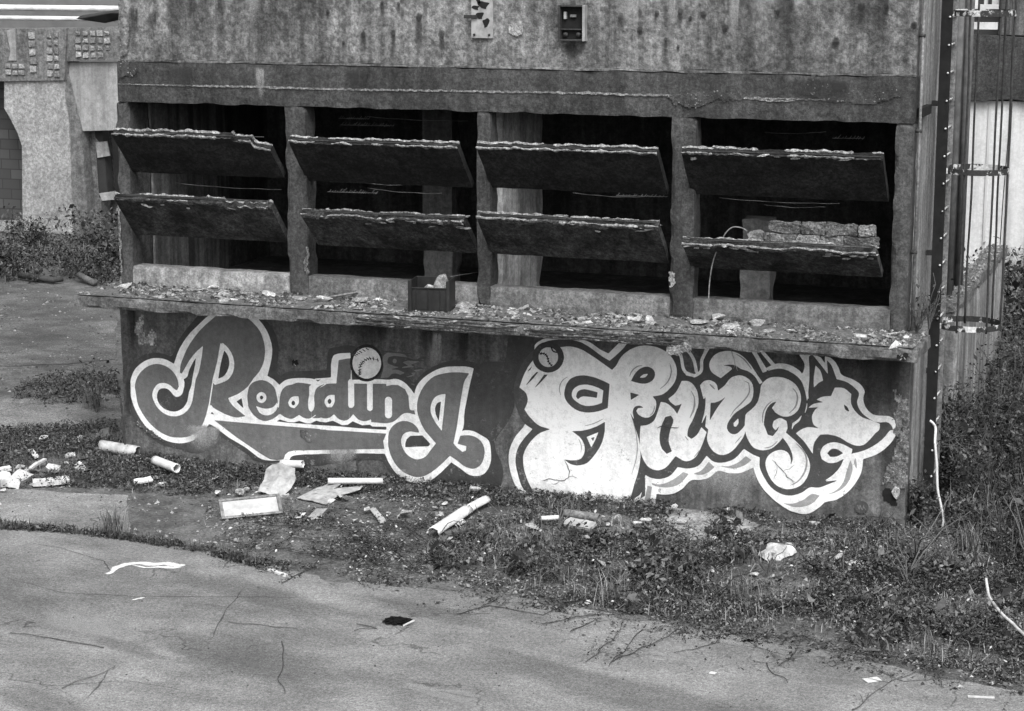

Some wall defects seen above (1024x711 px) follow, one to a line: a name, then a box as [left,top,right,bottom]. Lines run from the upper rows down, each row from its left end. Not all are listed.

spalling [882,389,911,506]